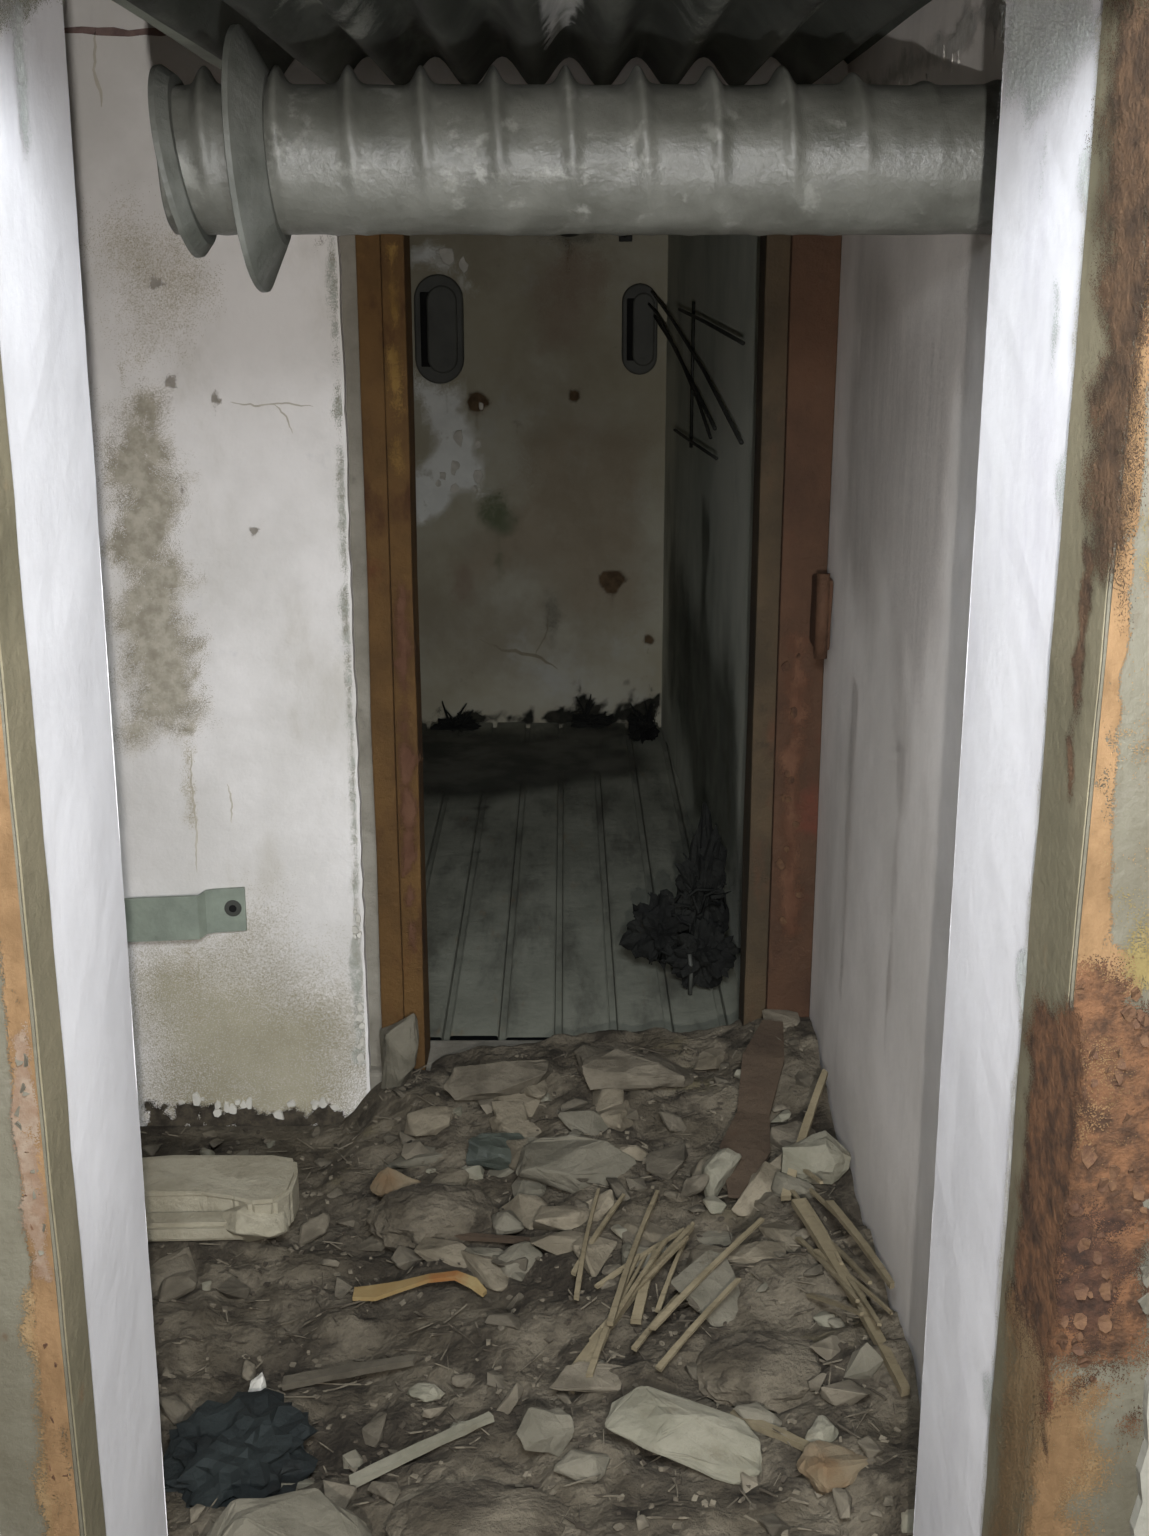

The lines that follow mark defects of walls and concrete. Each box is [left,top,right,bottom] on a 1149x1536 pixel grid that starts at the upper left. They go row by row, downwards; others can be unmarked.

water stain [79,181,227,833]
rust [985,0,1149,1536]
peeling [8,1021,55,1283]